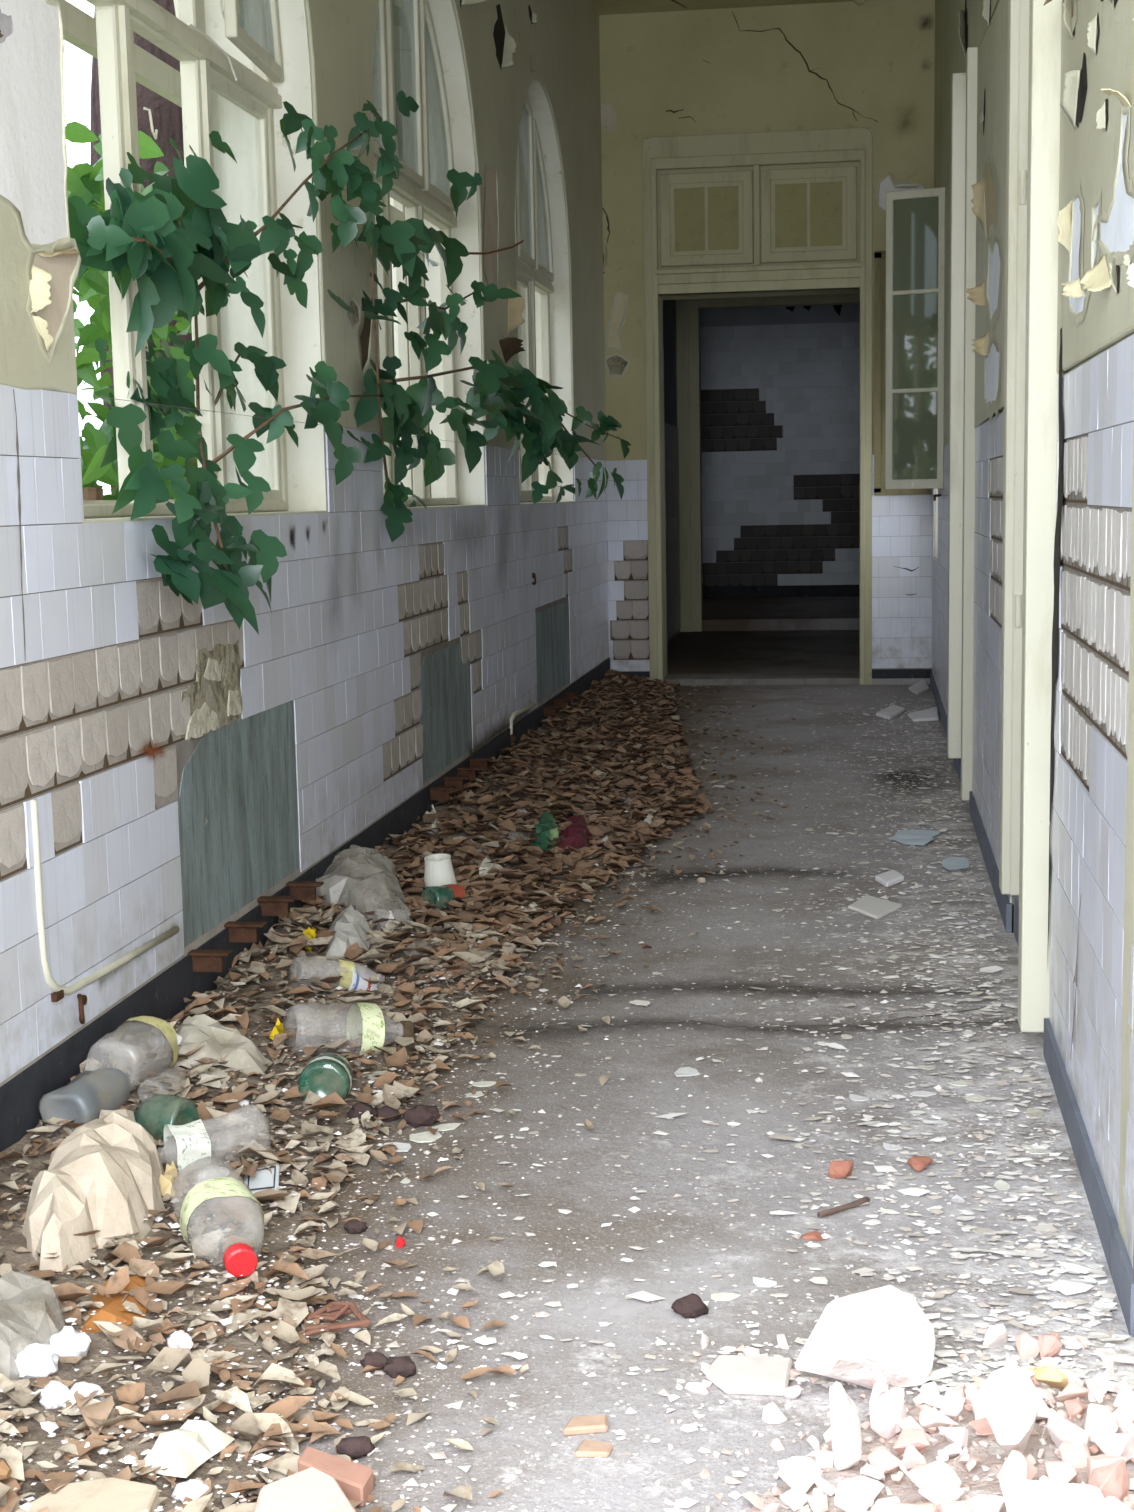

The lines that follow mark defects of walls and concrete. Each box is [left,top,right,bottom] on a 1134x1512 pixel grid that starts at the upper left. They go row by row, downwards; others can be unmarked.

peeling [0,0,81,368]
peeling [502,25,517,67]
crack [732,12,878,122]
peeling [1060,70,1080,130]
peeling [1056,88,1134,326]
spalling [0,578,244,881]